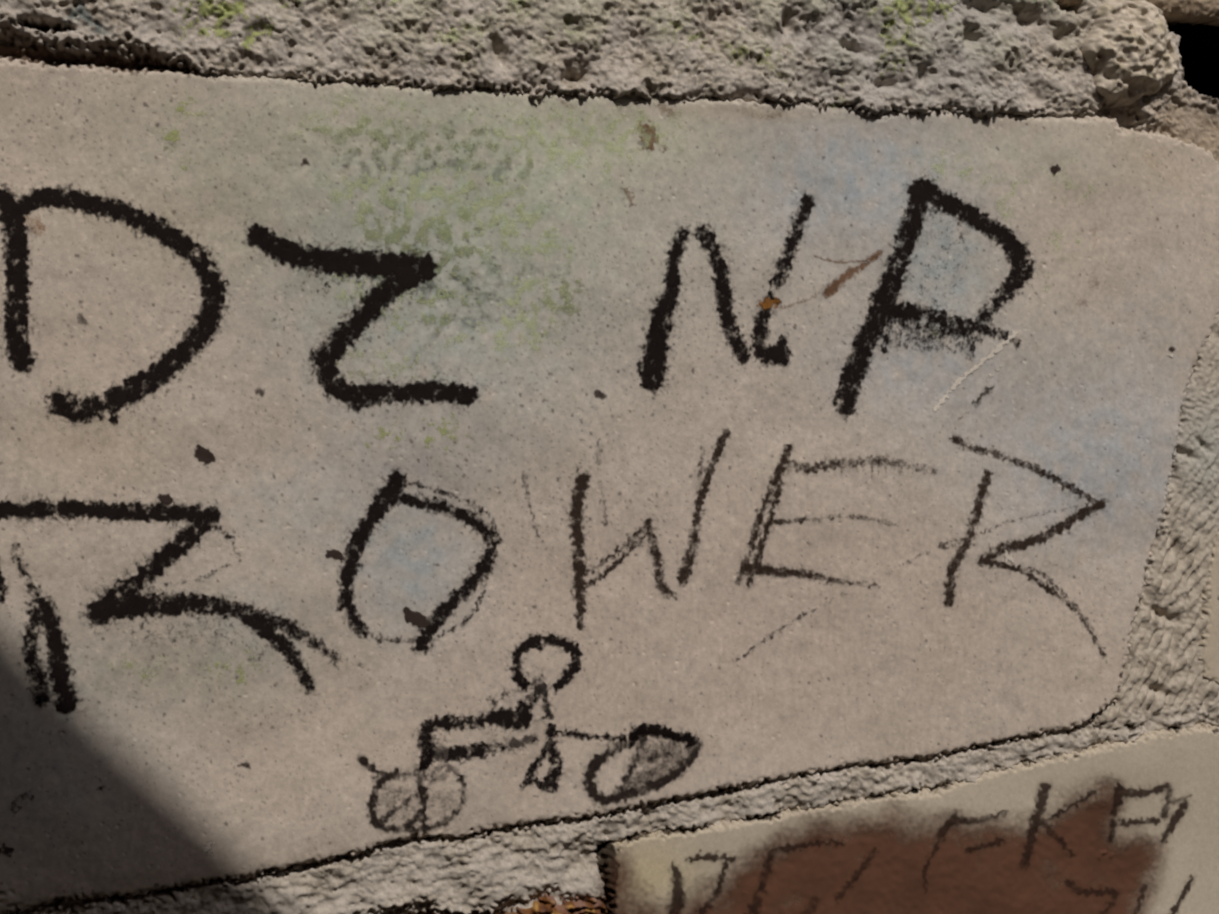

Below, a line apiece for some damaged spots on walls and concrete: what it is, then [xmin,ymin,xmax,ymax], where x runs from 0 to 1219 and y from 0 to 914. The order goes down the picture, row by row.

spalling [0,21,196,75]
rust [815,251,882,297]
rust [756,298,780,309]